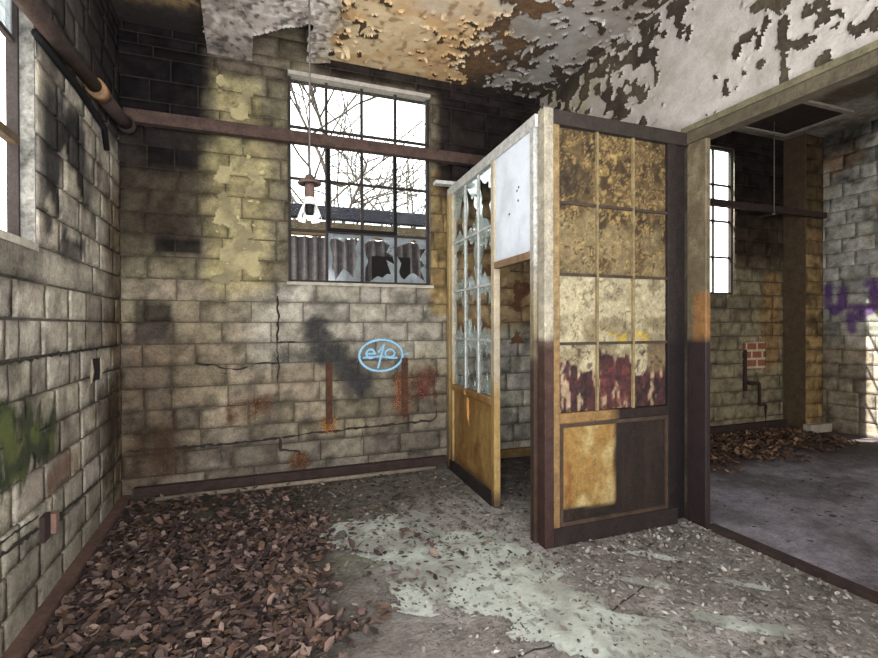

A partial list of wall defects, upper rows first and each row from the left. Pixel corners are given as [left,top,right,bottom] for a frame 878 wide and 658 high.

peeling [328,0,878,132]